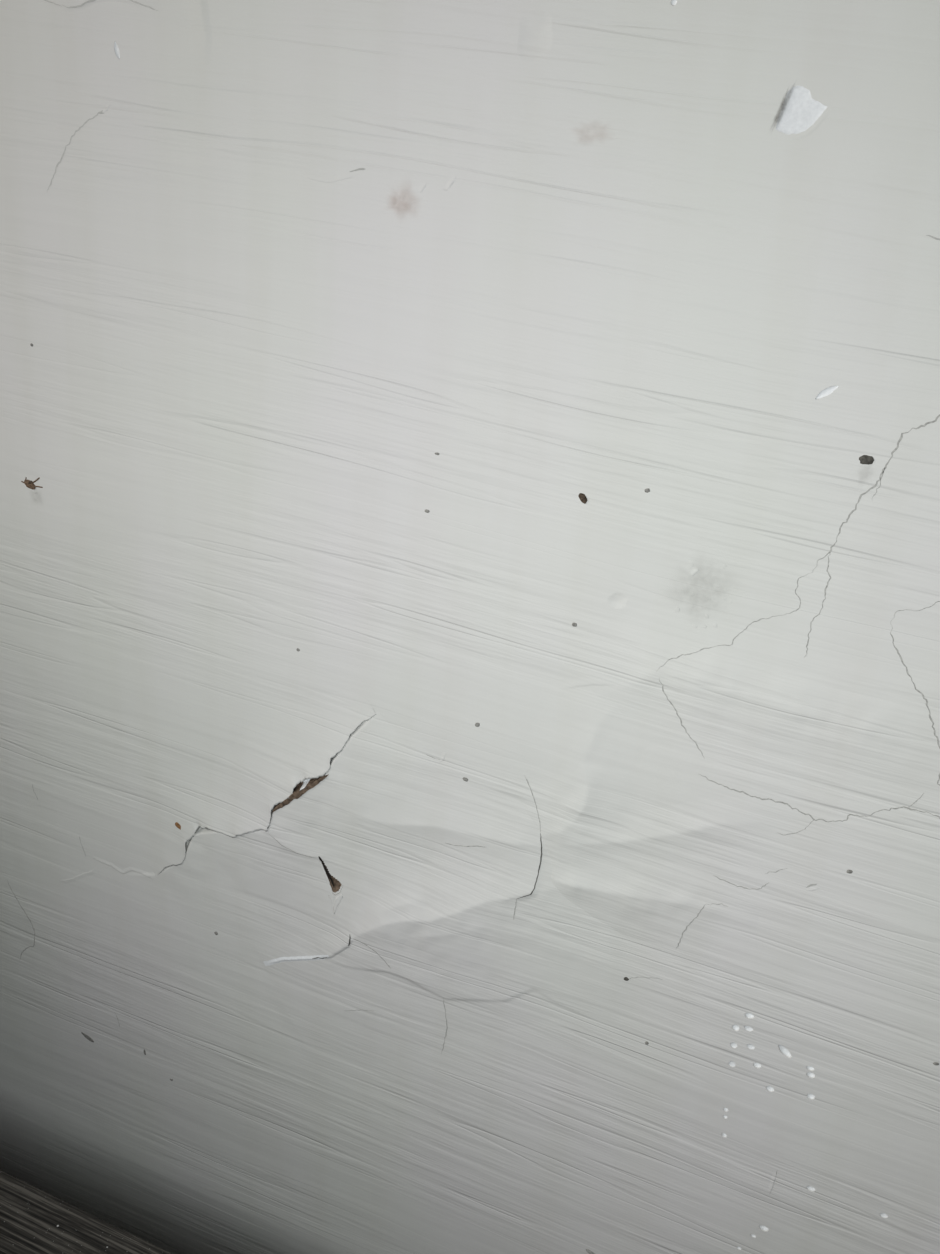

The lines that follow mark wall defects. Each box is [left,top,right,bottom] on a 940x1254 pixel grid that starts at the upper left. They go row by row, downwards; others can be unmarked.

peeling [776,86,828,141]
crack [659,415,940,835]
crack [676,868,787,948]